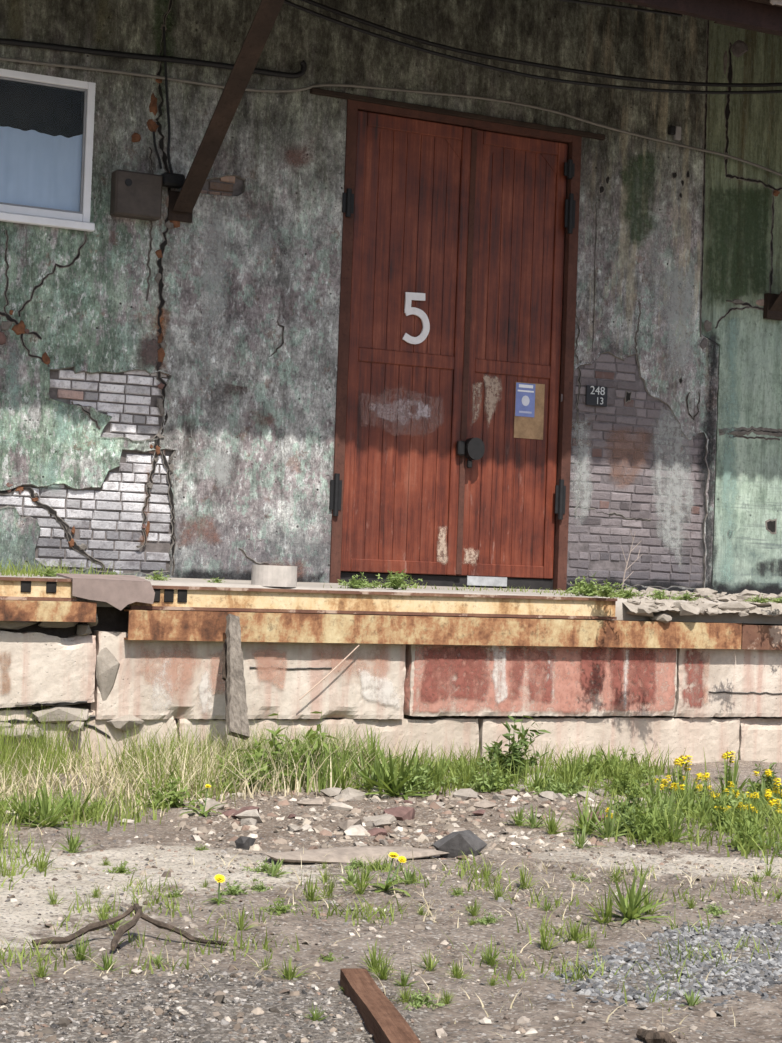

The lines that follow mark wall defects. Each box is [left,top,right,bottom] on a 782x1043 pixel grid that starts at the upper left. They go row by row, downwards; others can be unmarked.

crack [0,230,87,367]
crack [131,0,180,575]
leakage [708,189,770,302]
crack [0,482,106,571]
crack [71,401,101,430]
flaking render [0,339,220,577]
flaking render [561,350,782,617]
leakage [566,321,782,595]
crack [729,434,780,442]
corrosion [404,645,706,715]